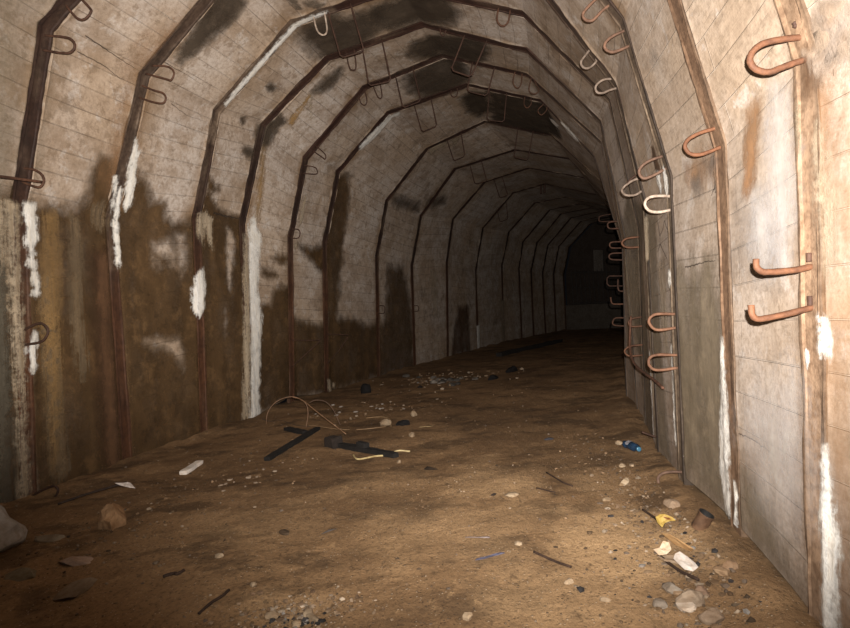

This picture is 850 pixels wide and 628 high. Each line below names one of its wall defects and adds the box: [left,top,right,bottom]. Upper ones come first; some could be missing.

leakage [225,0,488,105]
leakage [462,93,578,142]
leakage [656,166,668,195]
rust [743,104,759,196]
leakage [0,68,413,503]
leakage [623,200,775,553]
leakage [818,449,841,628]